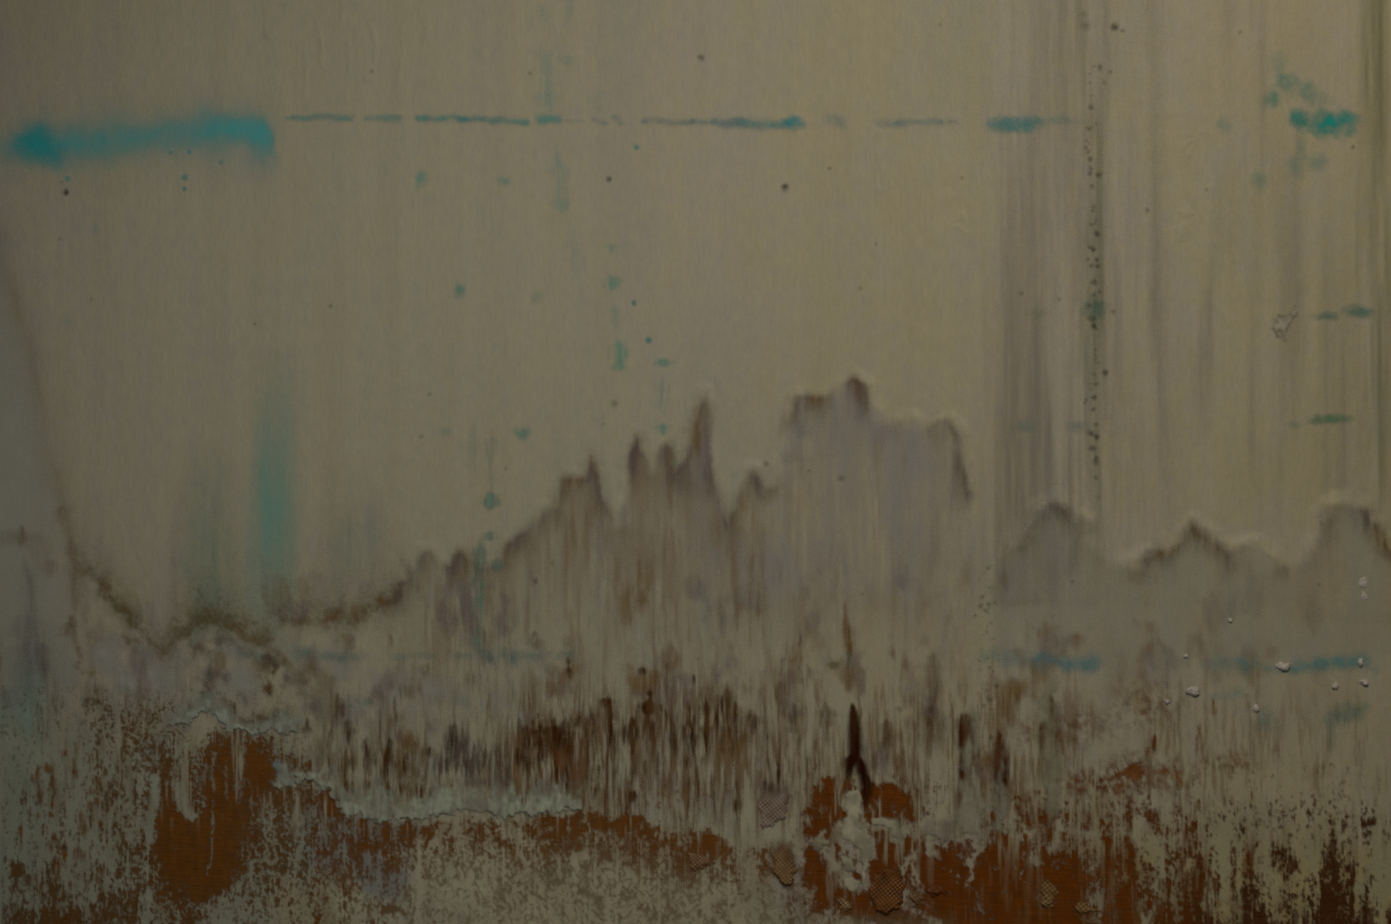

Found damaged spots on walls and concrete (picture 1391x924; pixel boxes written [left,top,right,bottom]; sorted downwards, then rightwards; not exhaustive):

corrosion [328,732,431,799]
corrosion [428,690,754,817]
peeling [1,700,1391,924]
corrosion [845,704,871,804]